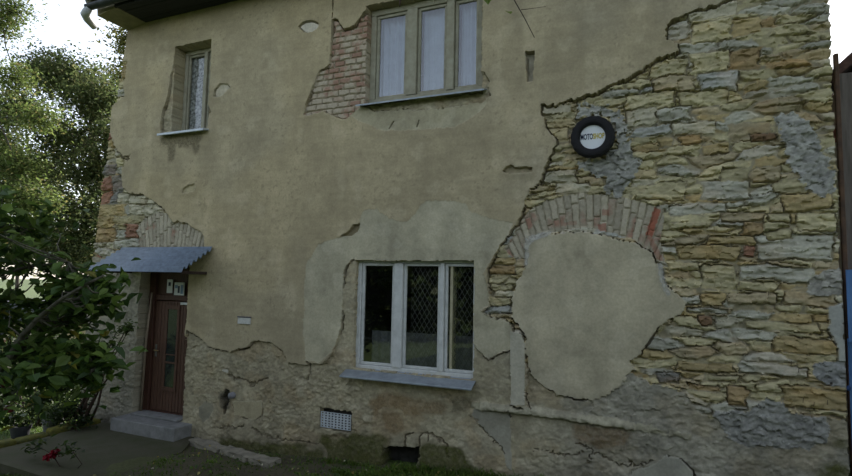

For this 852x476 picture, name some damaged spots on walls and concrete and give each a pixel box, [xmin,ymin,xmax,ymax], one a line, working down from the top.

flaking render [92,133,204,265]
flaking render [181,0,850,476]
flaking render [79,272,151,423]
crack [405,431,449,456]